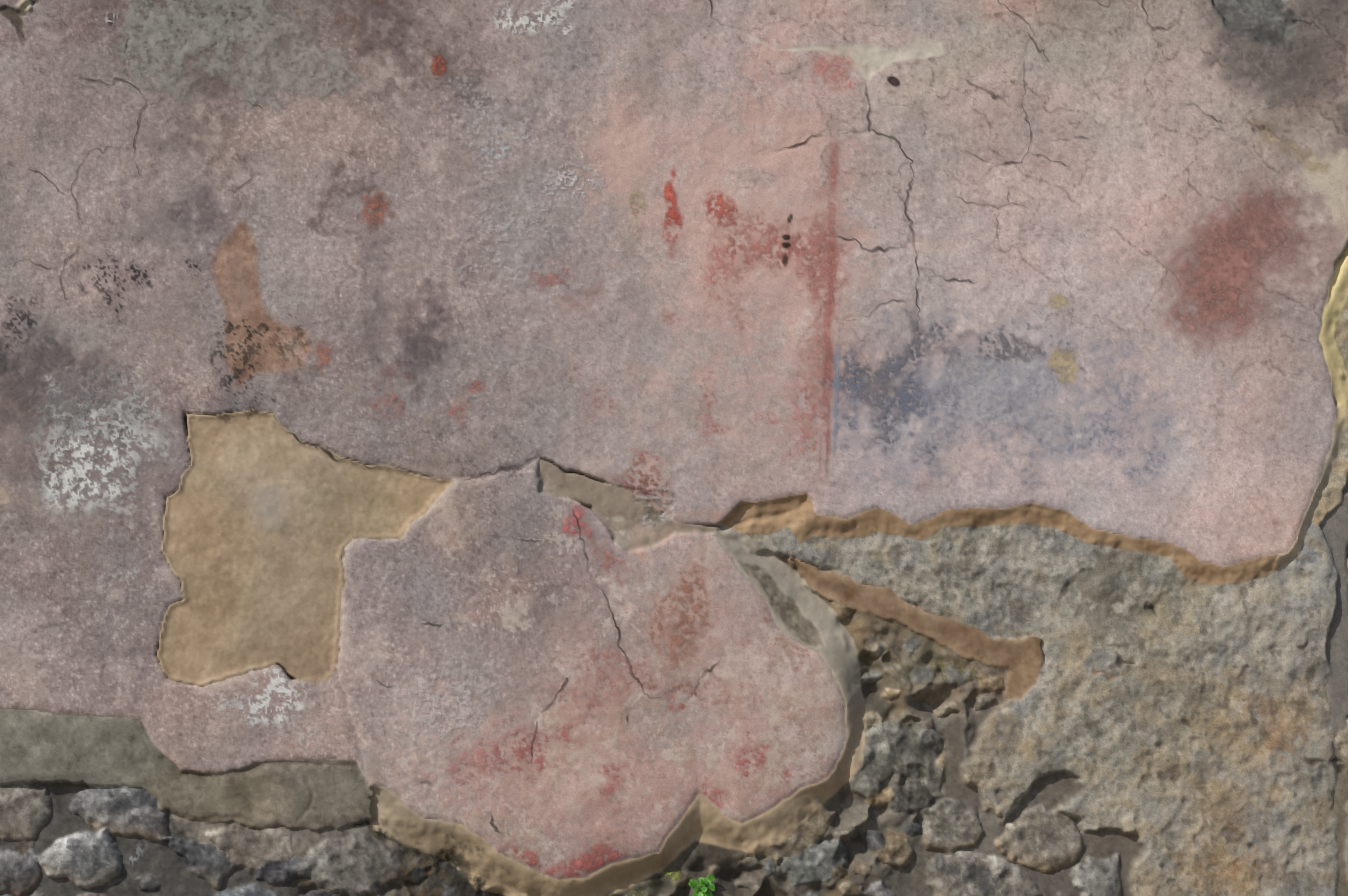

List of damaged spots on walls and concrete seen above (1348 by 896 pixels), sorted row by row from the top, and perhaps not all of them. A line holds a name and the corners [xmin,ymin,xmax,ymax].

flaking render [749,523,1341,896]